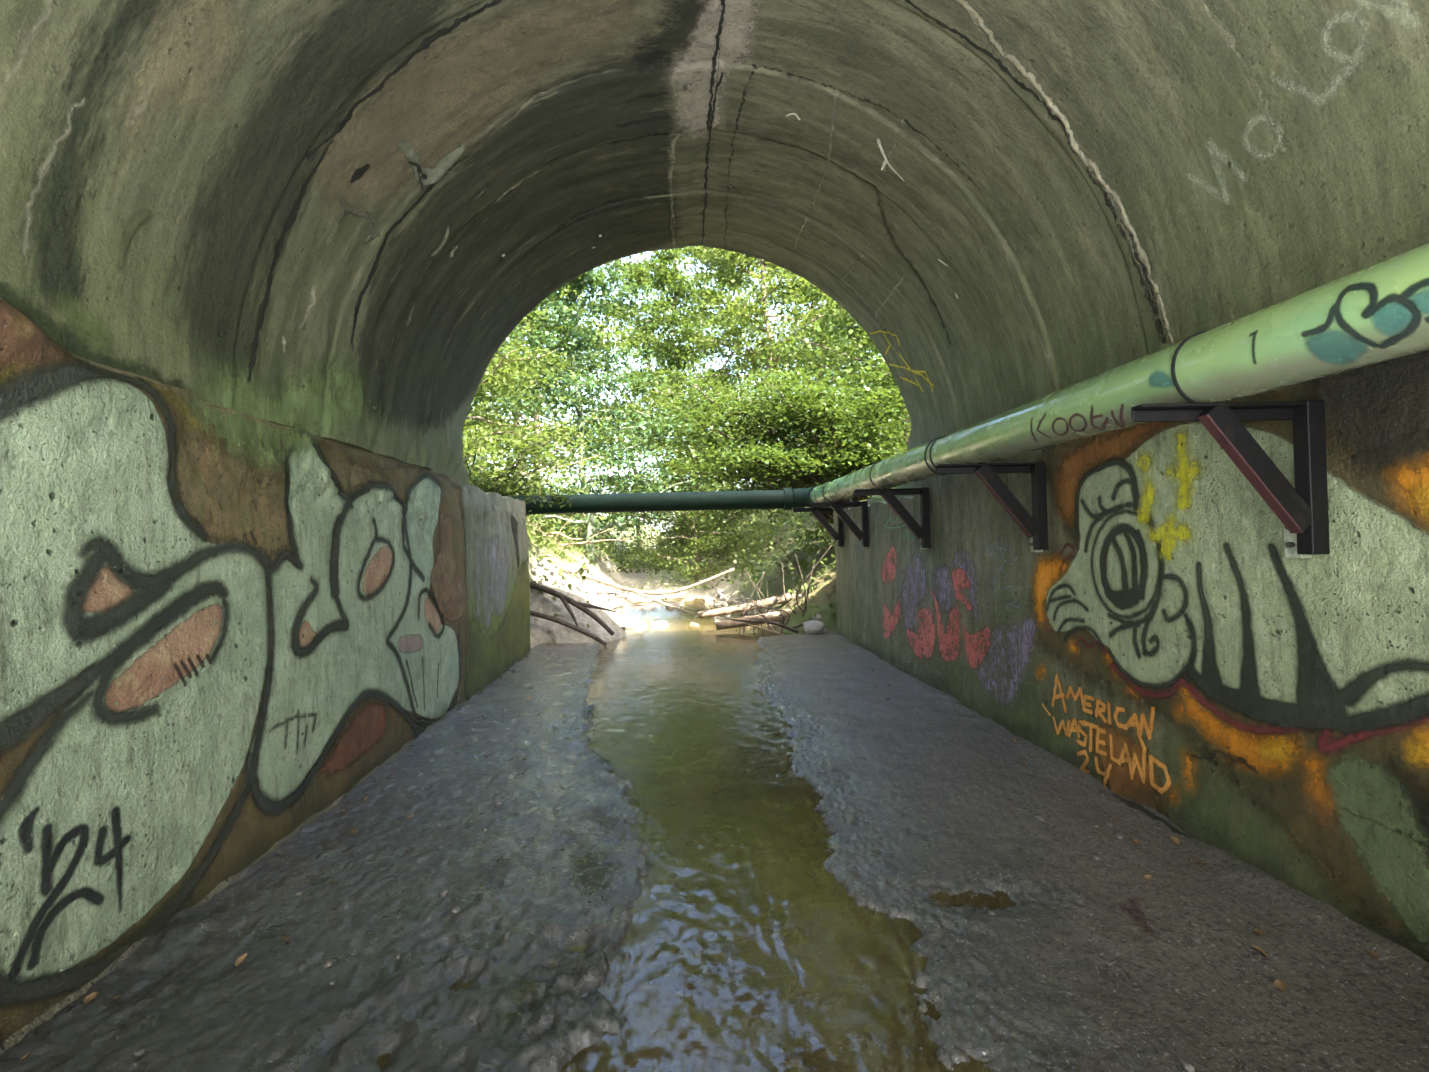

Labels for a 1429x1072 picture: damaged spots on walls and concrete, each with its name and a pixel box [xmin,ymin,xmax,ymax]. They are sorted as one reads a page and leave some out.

crack [248,0,502,381]
water stain [187,0,758,426]
crack [510,0,981,344]
crack [905,0,1174,344]